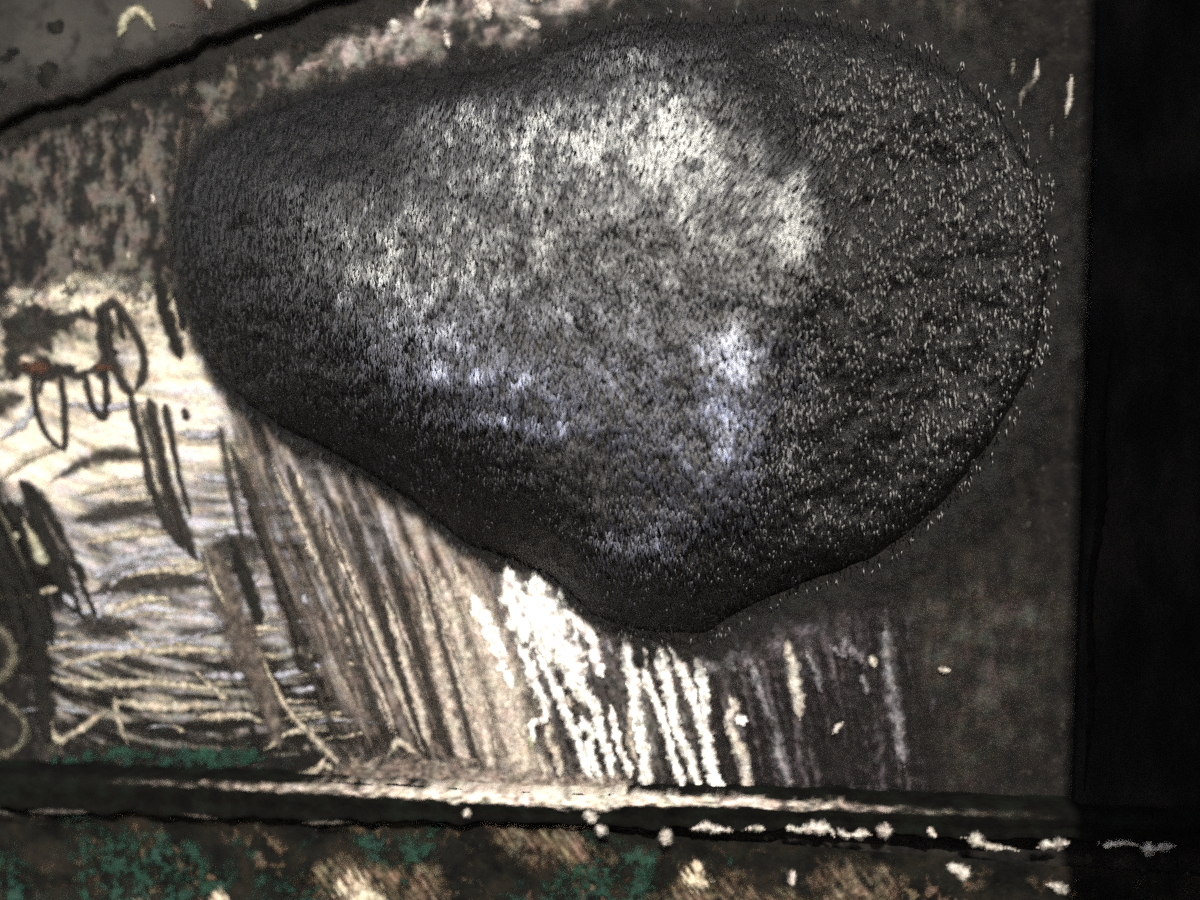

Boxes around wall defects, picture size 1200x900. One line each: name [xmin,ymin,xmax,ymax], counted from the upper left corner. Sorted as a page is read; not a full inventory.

crack [0,0,447,198]